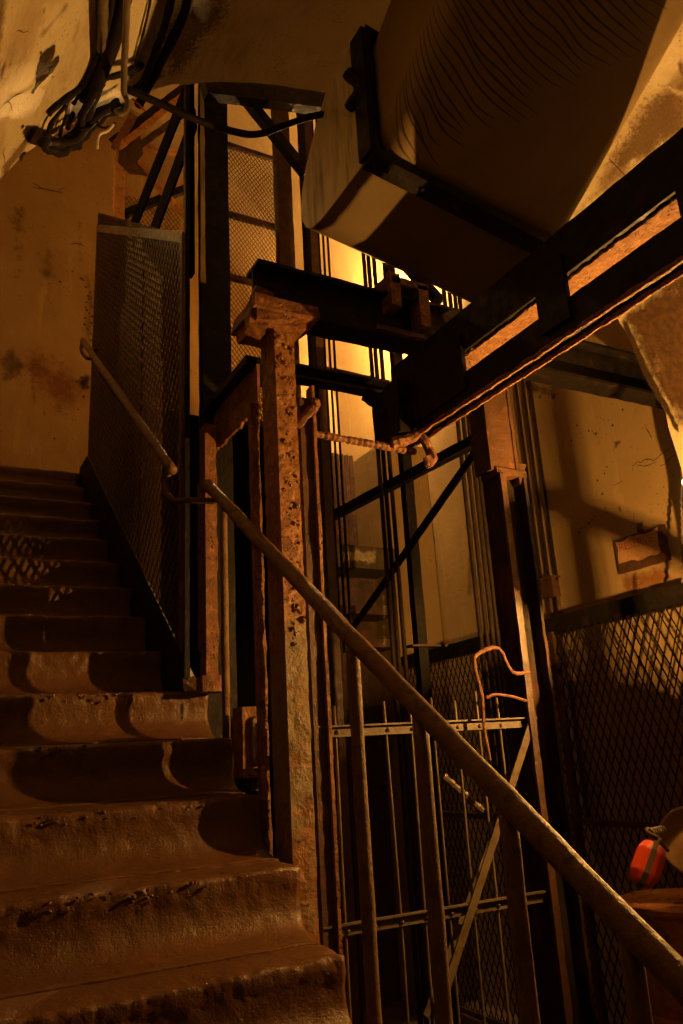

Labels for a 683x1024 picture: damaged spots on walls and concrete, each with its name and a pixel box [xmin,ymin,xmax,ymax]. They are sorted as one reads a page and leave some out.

crack [613,428,676,486]